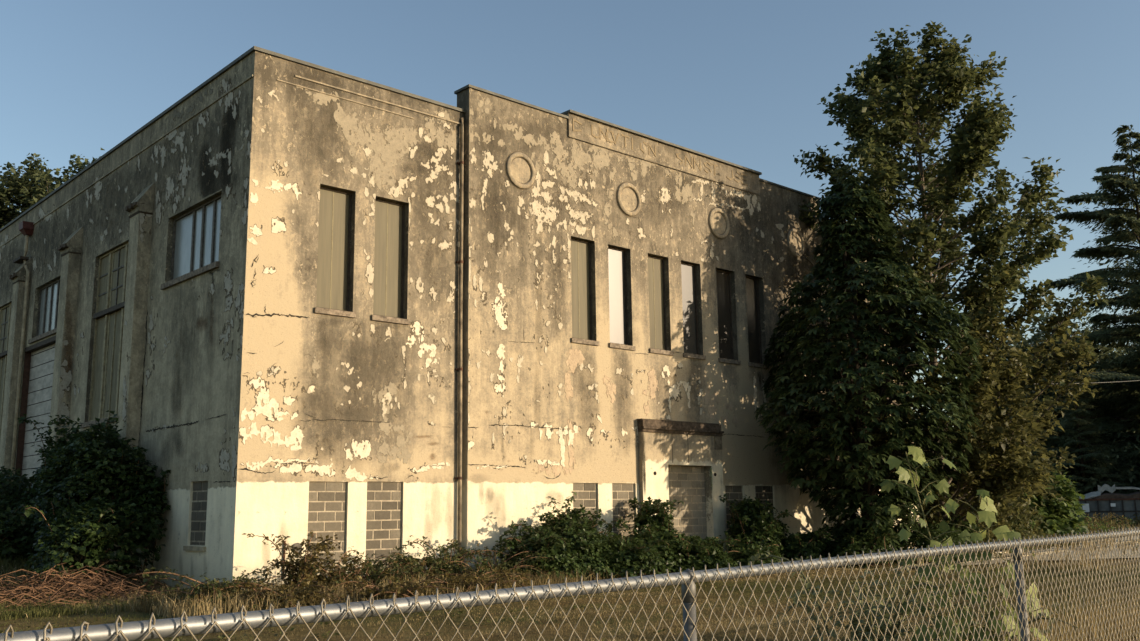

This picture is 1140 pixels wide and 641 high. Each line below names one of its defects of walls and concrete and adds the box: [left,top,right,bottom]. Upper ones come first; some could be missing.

water stain [199,103,239,197]
peeling [128,78,329,245]
crack [244,254,310,392]
peeling [192,85,784,482]